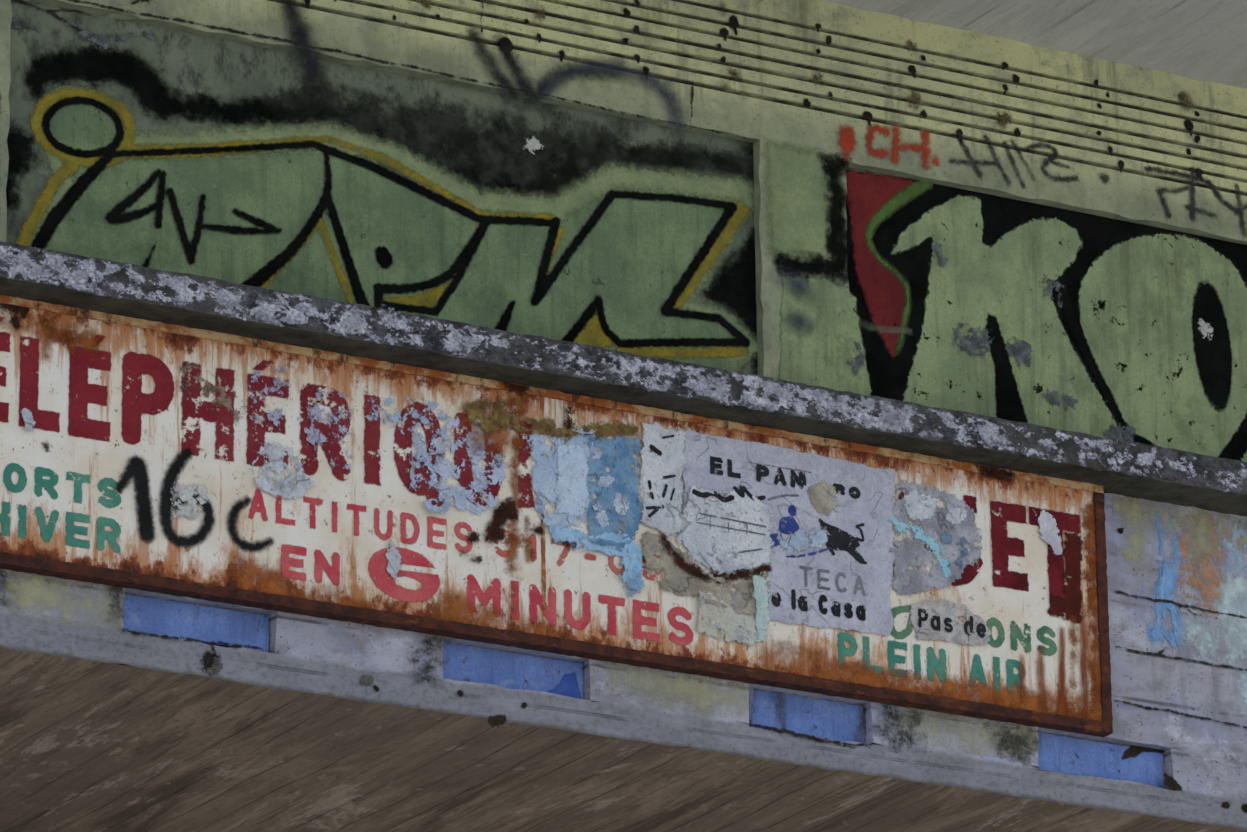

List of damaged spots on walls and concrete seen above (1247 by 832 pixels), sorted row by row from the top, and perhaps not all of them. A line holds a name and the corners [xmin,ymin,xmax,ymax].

corrosion [0,303,102,358]
corrosion [180,361,247,426]
peeling [0,246,1247,491]
corrosion [460,382,638,568]
corrosion [975,464,1015,482]
corrosion [236,557,374,609]
corrosion [661,533,772,584]
corrosion [435,593,557,637]
corrosion [785,504,1102,720]